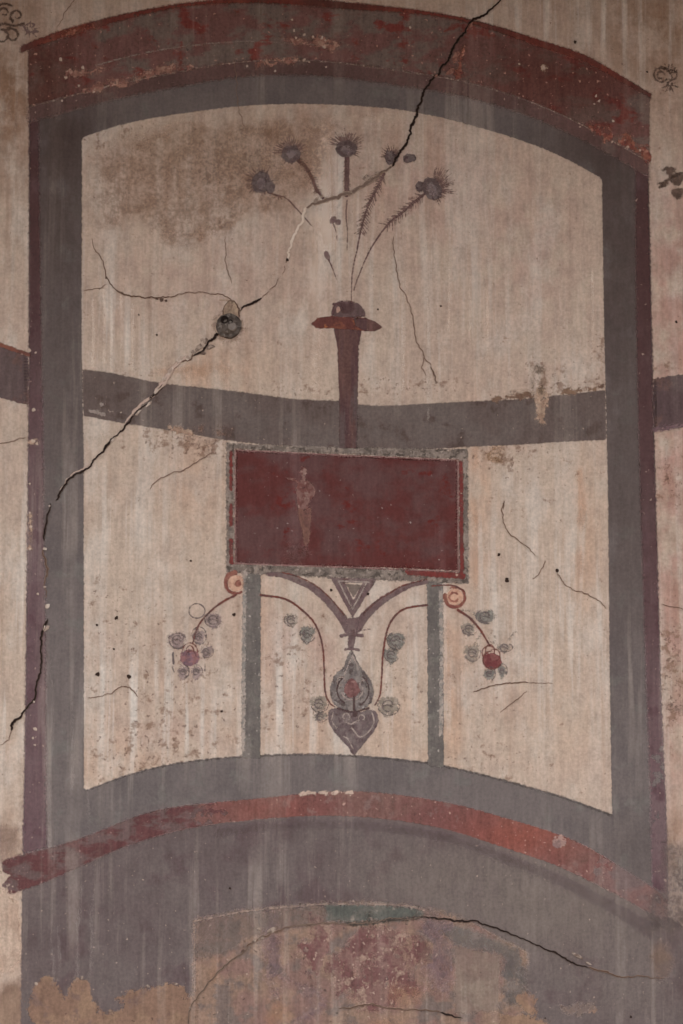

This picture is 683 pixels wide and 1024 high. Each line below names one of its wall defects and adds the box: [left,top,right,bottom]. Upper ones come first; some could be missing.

peeling [246,19,339,72]
peeling [59,57,193,94]
crack [1,0,501,745]
peeling [492,384,604,424]
crack [501,501,605,606]
crack [187,916,662,1024]
peeling [26,976,199,1024]